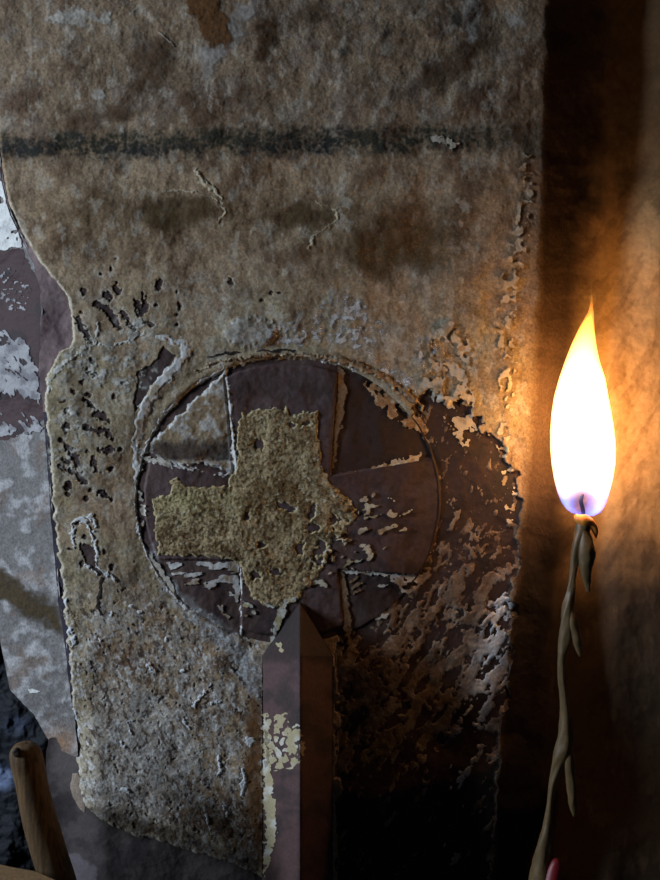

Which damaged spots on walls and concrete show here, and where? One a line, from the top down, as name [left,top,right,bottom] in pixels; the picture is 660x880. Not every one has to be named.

peeling [431,135,460,151]
flaking render [80,281,158,331]
flaking render [133,346,176,411]
flaking render [0,178,123,700]
flaking render [139,456,172,471]
flaking render [305,152,534,880]
flaking render [147,553,256,617]
flaking render [263,597,296,653]
flaking render [190,682,223,708]
flaking render [46,712,306,880]